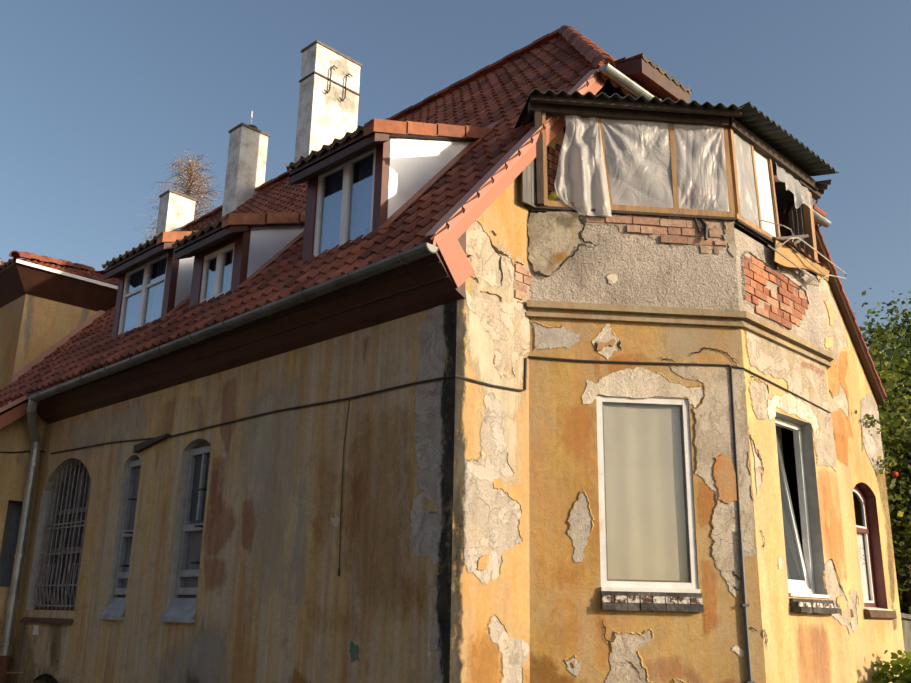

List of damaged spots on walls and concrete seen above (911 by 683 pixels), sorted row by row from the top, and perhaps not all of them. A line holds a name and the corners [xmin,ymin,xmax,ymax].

peeling [465,220,581,379]
crack [533,215,603,277]
flaking render [582,214,809,330]
corrosion [204,460,254,589]
peeling [409,305,445,683]
leakage [436,247,527,683]
peeling [462,392,523,584]
peeling [582,277,885,597]
peeling [487,613,529,683]
leakage [530,657,569,683]
peeling [605,628,654,683]
peeling [823,558,859,634]